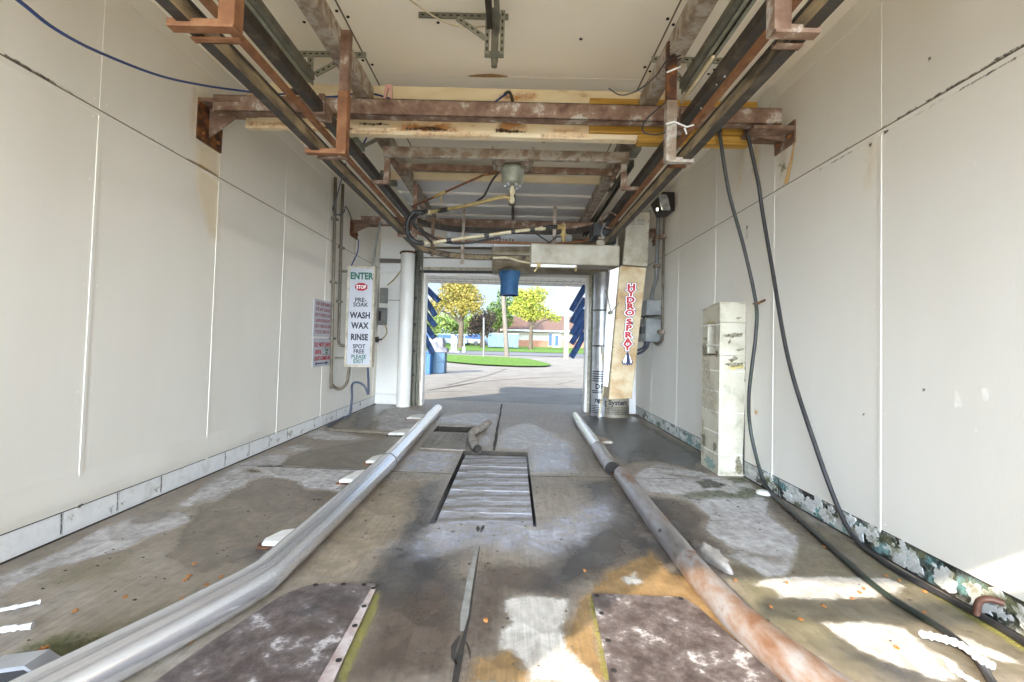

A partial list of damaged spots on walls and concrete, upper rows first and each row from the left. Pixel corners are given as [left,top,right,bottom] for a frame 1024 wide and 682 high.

leakage [0,405,425,586]
peeling [748,470,1024,632]